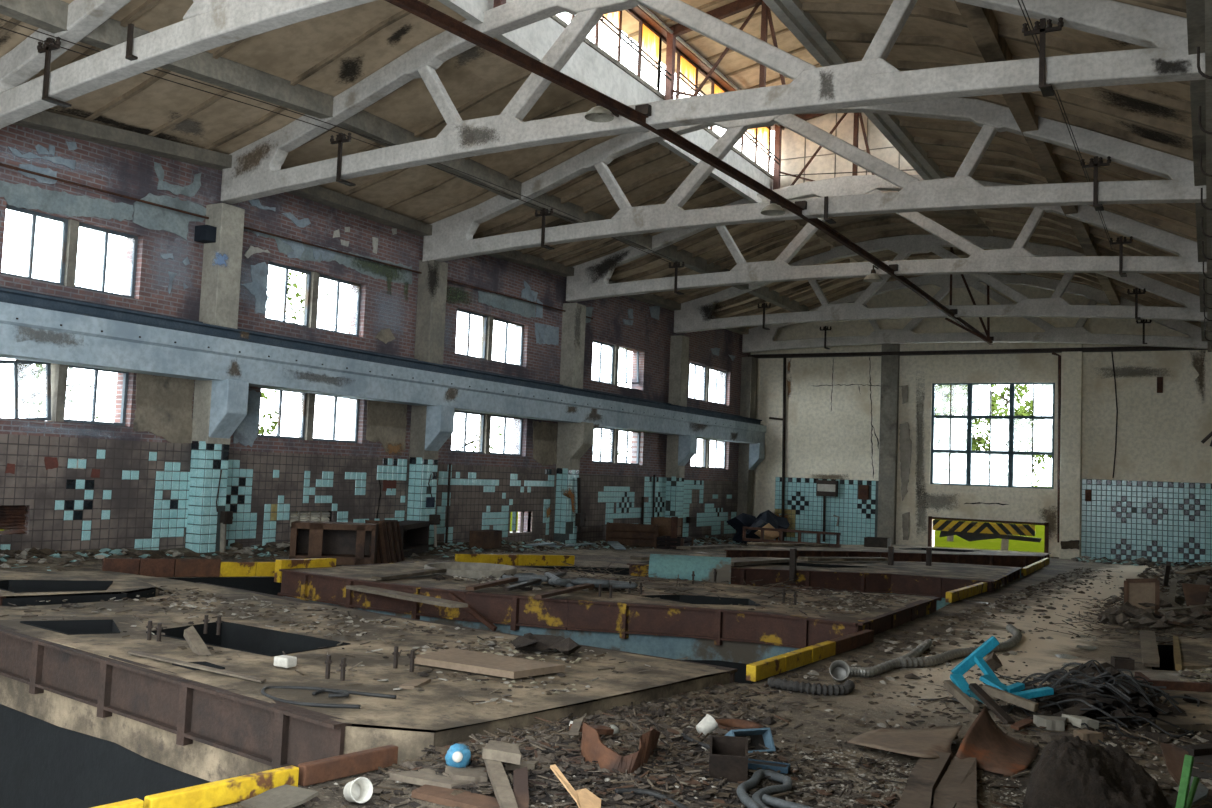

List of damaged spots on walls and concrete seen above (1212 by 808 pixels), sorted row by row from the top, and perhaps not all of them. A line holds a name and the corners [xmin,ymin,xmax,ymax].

water stain [339,57,362,83]
water stain [1155,59,1191,74]
flaking render [0,141,207,240]
flaking render [241,199,412,314]
peeling [435,421,558,542]